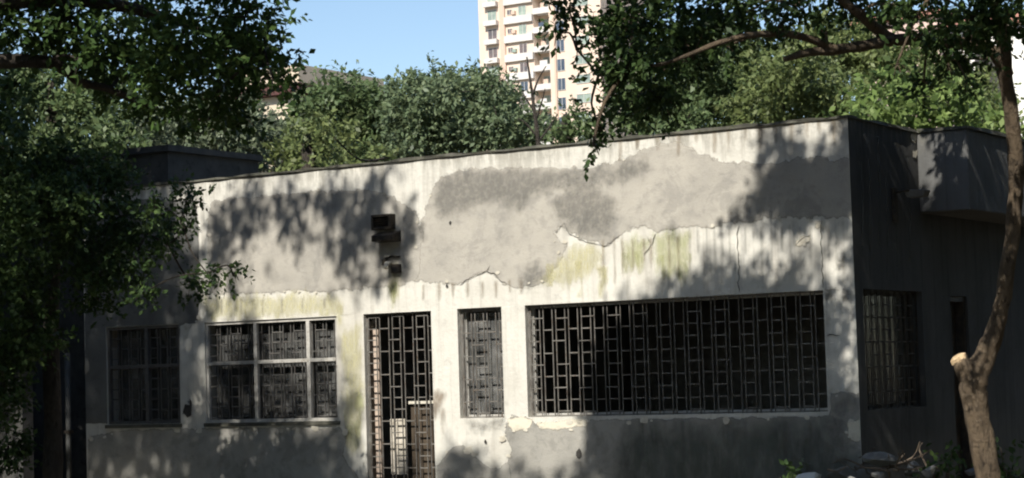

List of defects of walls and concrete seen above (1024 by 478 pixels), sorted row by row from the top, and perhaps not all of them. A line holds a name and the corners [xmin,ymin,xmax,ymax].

peeling [85,141,862,478]